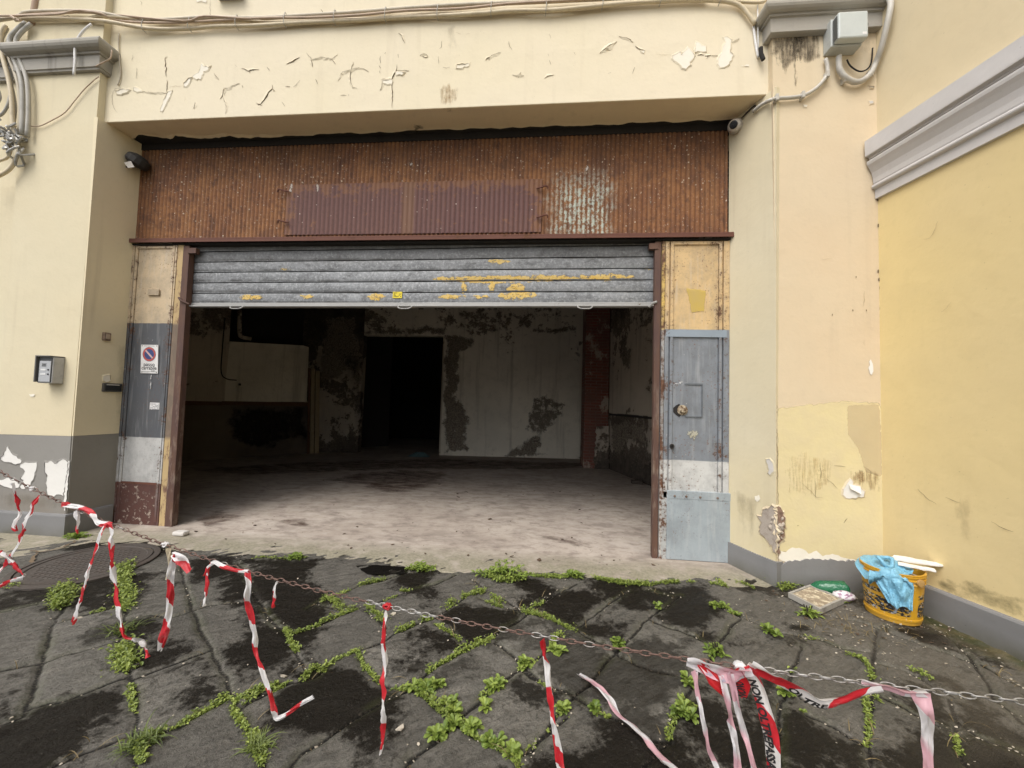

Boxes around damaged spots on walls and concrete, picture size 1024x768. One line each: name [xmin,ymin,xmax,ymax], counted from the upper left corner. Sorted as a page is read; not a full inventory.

peeling [671,36,735,71]
leakage [775,36,818,66]
peeling [160,63,211,113]
peeling [0,445,70,511]
peeling [841,478,866,500]
spalling [755,495,856,562]